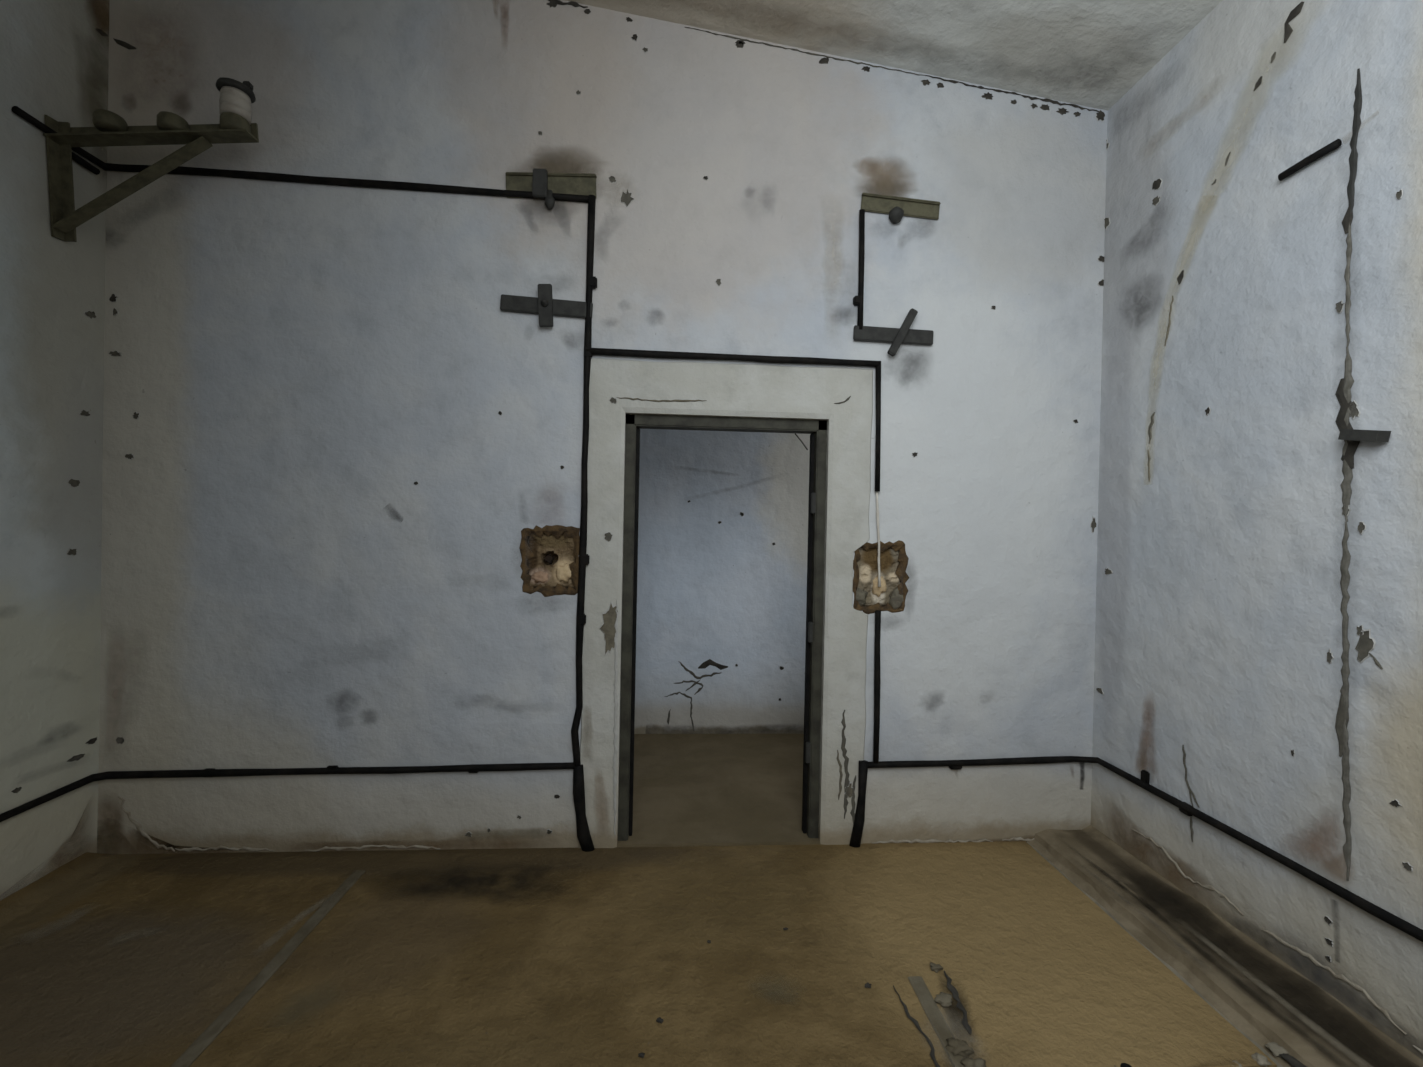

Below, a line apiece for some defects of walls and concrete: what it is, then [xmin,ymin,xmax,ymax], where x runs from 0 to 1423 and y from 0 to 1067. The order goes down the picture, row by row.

crack [1327,68,1366,881]
leakage [1088,860,1412,1067]